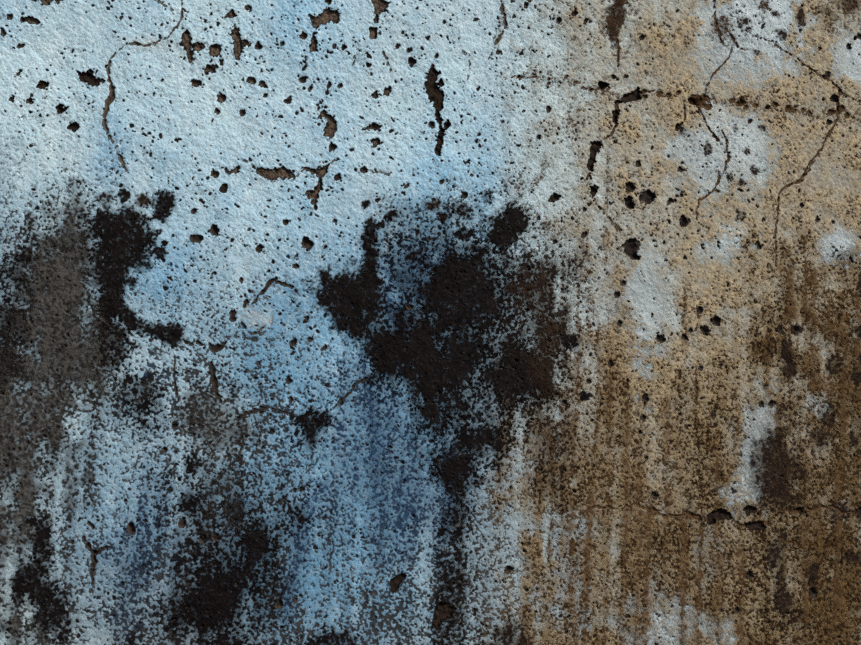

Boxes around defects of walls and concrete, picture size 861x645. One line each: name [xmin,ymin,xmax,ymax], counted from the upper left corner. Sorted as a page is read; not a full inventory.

water stain [0,176,591,645]
rust [503,157,549,199]
crack [511,39,620,144]
crack [594,198,623,231]
rust [519,0,861,645]
crack [640,0,861,264]